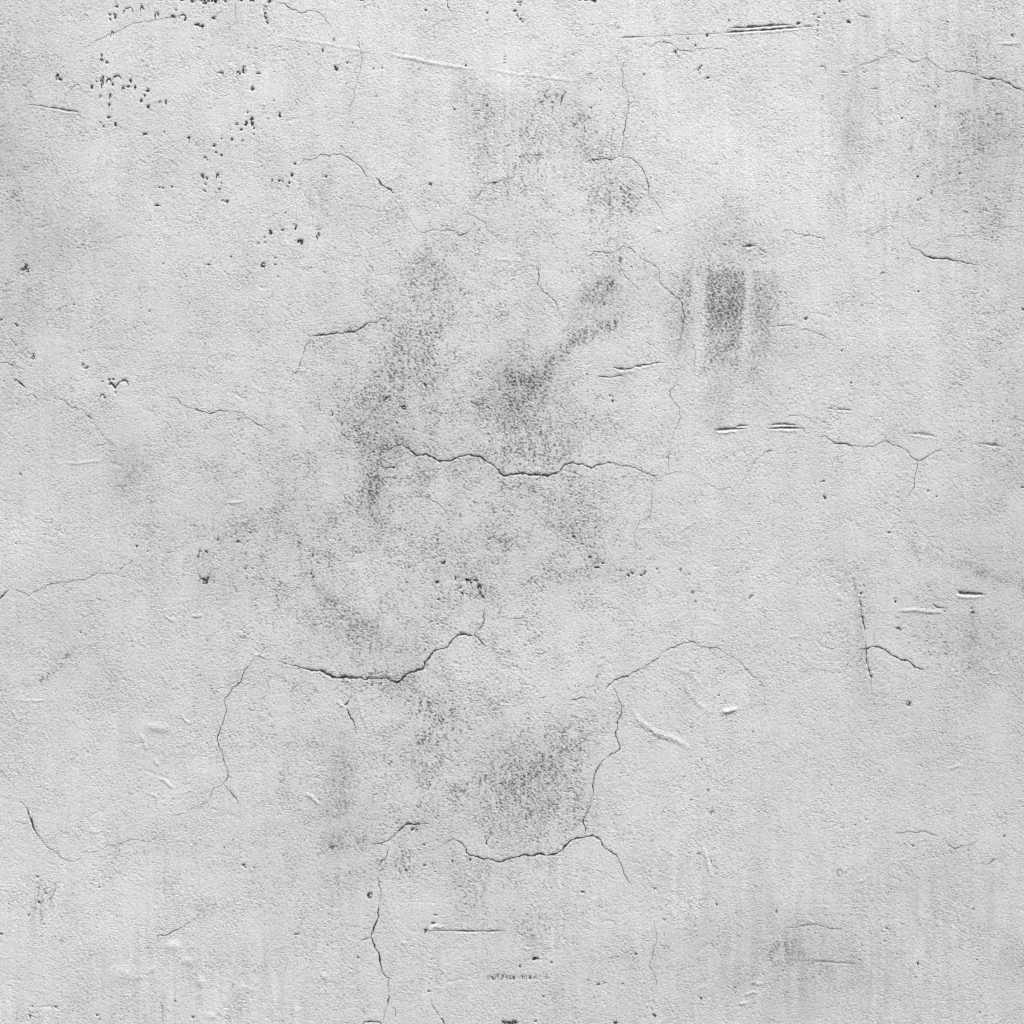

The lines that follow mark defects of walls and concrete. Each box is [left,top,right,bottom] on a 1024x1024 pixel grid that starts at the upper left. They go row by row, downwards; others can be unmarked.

leakage [491,321,616,464]
crack [380,245,774,553]
crack [787,414,940,494]
crack [174,609,522,815]
crack [346,628,925,1023]